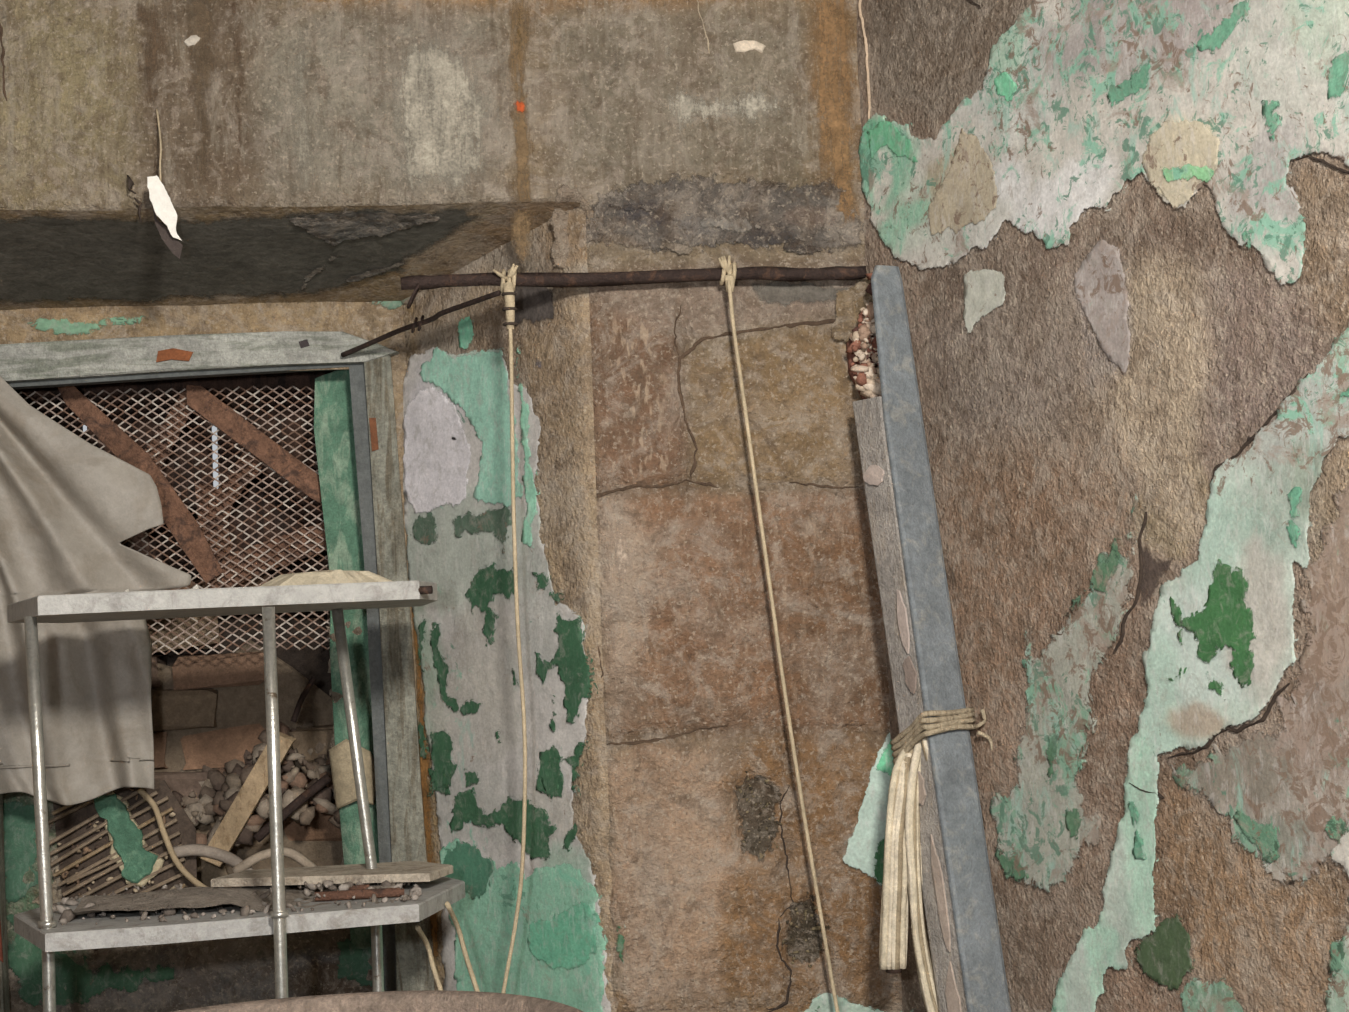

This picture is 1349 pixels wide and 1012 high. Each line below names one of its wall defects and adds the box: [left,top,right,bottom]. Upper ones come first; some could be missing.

peeling [585,0,1349,333]
peeling [1074,237,1131,375]
crack [596,305,836,498]
crack [790,481,857,489]
crack [1112,512,1148,654]
peeling [402,316,627,1012]
crack [607,724,728,745]
crack [1129,783,1165,798]
peeling [989,322,1349,1012]
crack [1171,683,1290,757]
crack [766,785,794,1012]